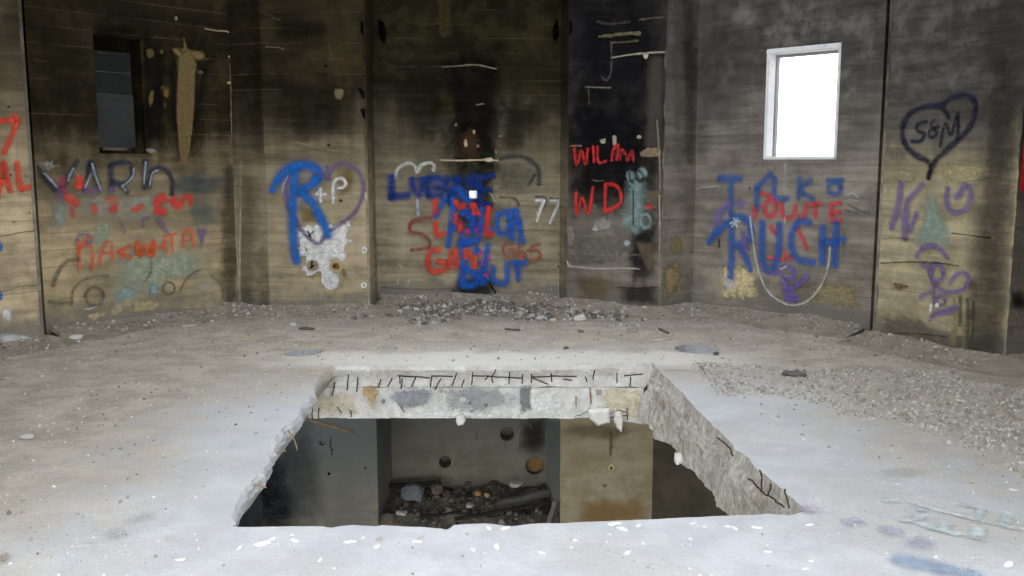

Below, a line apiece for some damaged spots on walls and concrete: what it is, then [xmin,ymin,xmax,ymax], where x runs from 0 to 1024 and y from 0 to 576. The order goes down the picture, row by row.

rust [363,387,378,400]
spalling [231,362,804,527]